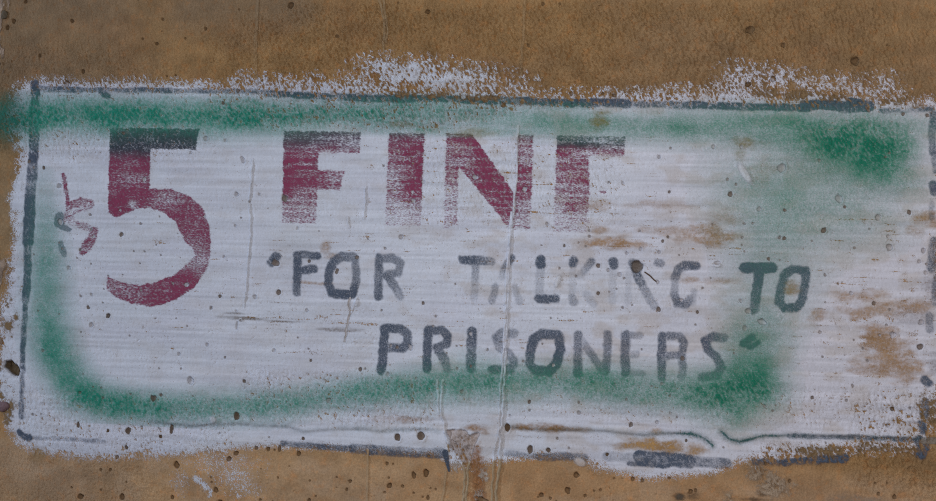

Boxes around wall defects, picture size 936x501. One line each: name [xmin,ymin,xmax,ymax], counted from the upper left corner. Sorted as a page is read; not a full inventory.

spalling [446,429,480,463]